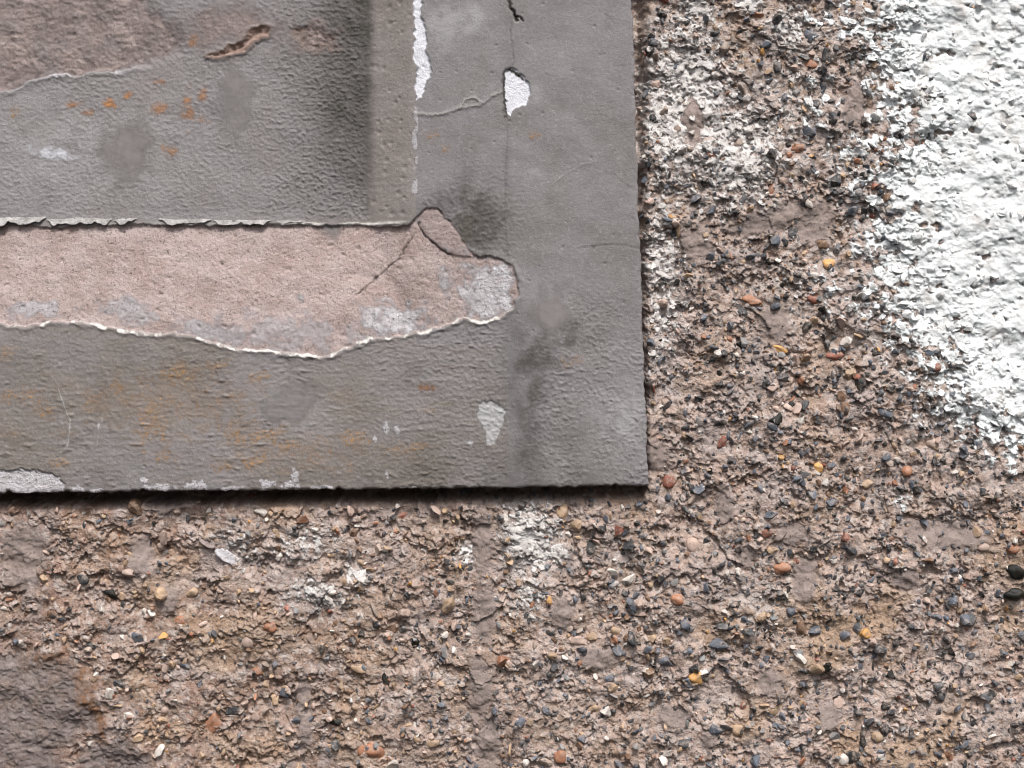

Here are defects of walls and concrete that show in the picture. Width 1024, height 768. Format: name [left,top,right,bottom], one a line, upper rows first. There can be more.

spalling [0,0,177,91]
spalling [197,10,271,58]
spalling [294,19,337,51]
spalling [412,0,432,194]
crack [417,90,502,116]
spalling [503,68,530,117]
peeling [0,208,519,358]
spalling [477,400,506,445]
spalling [0,468,104,493]
spalling [138,477,207,491]
spalling [259,468,333,490]